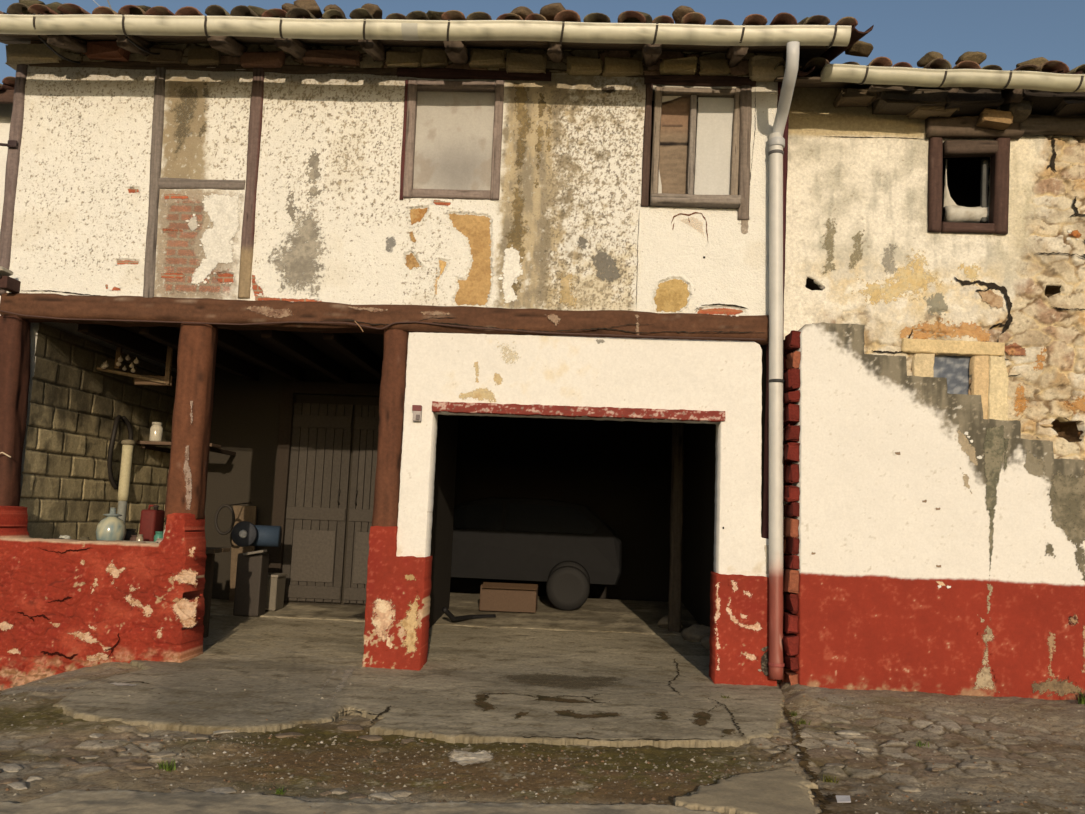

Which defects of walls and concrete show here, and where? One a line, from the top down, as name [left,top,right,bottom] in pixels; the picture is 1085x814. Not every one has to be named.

damp [505,83,557,263]
peeling [161,193,242,287]
damp [268,149,329,295]
flaking render [402,199,523,307]
damp [577,235,621,282]
damp [823,218,837,274]
crack [954,277,1020,377]
crack [40,651,77,660]
peeling [169,547,202,628]
peeling [368,574,424,660]
crack [501,697,744,741]
crack [770,704,837,814]